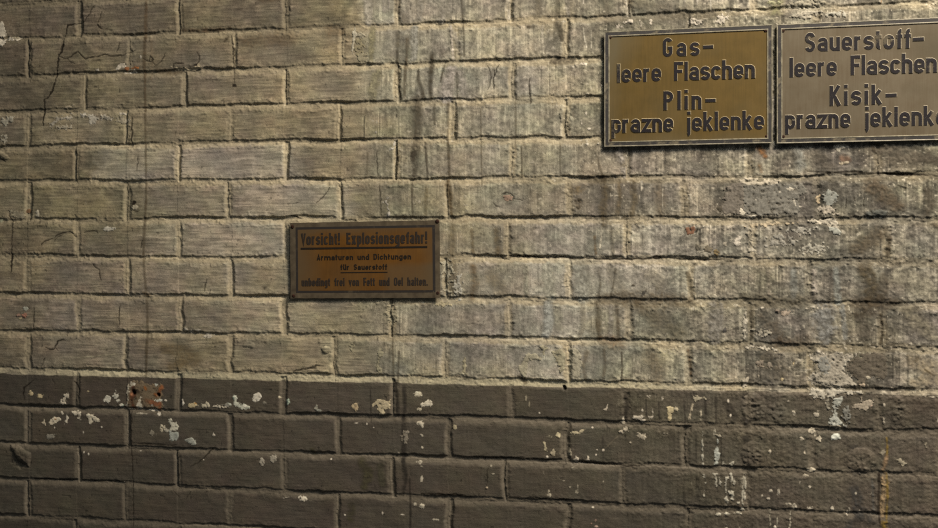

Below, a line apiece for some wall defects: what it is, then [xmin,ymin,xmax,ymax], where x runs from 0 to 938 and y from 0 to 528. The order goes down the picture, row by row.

peeling [0,21,25,46]
crack [42,15,202,126]
damp [351,0,424,103]
damp [411,0,467,179]
peeling [741,309,784,388]
peeling [42,393,103,440]
peeling [103,380,196,445]
peeling [182,392,267,410]
peeling [372,399,391,415]
peeling [397,391,433,454]
peeling [806,350,889,411]